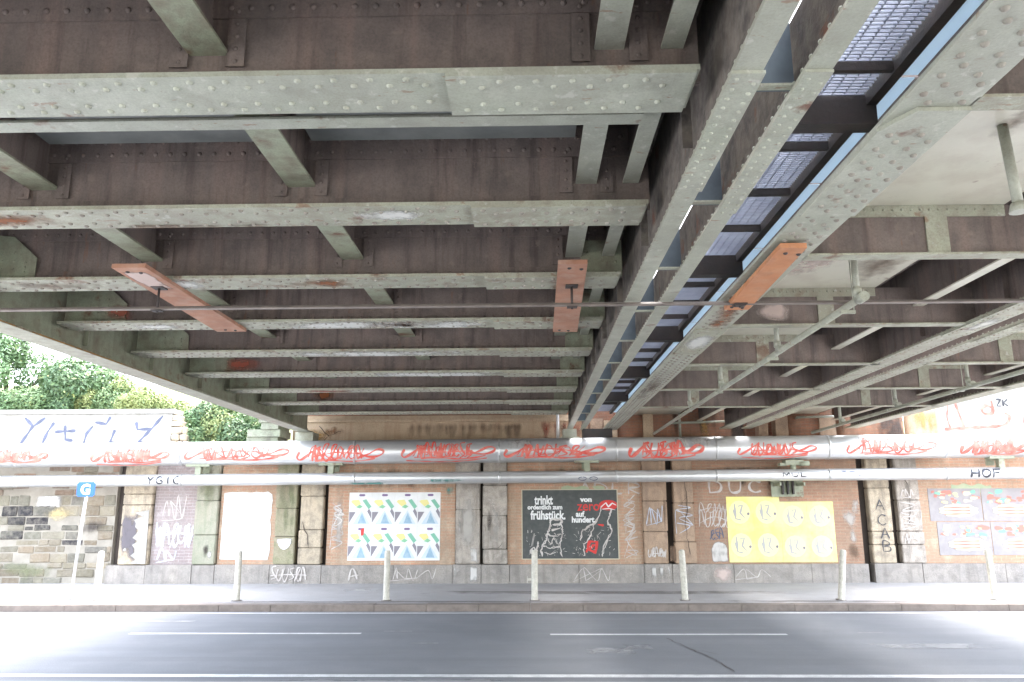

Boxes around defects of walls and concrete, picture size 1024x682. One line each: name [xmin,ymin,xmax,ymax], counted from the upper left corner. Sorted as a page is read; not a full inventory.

peeling [361,211,416,220]
corrosion [228,360,255,369]